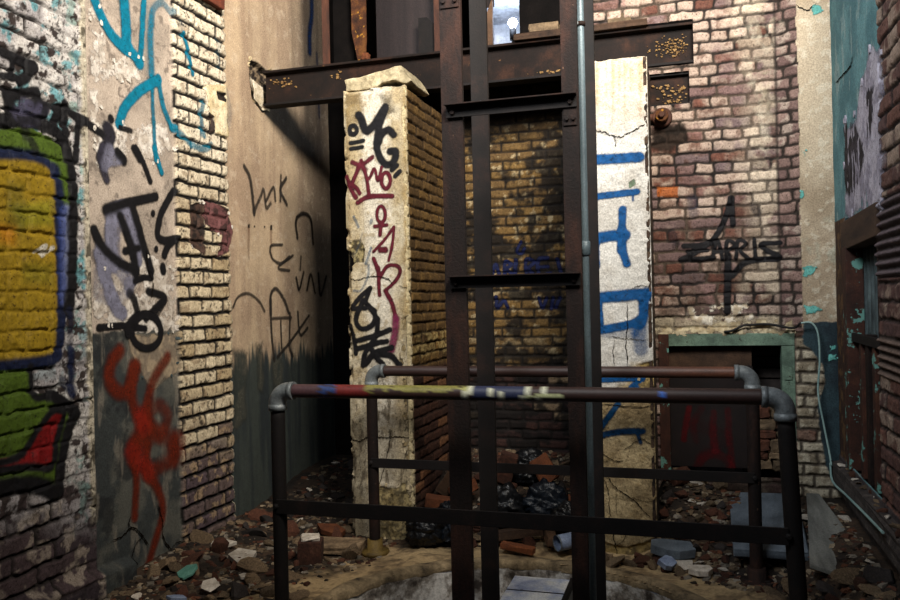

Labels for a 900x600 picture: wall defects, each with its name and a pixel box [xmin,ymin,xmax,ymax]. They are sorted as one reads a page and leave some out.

crack [596,124,645,146]
peeling [843,44,886,218]
leakage [233,345,283,427]
crack [112,506,182,565]
crack [603,439,653,554]